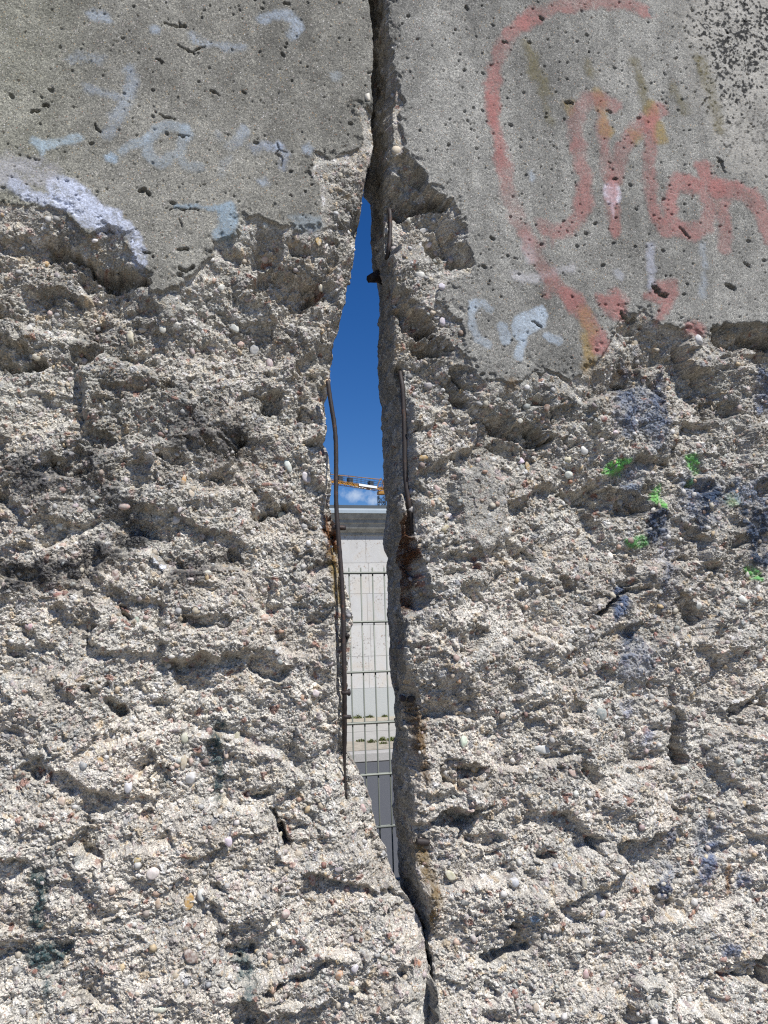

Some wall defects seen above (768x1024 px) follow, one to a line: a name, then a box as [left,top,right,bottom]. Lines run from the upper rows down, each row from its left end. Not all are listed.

spalling [0,105,434,1024]
corrosion [324,516,340,600]
corrosion [396,513,419,610]
spalling [381,39,768,1024]